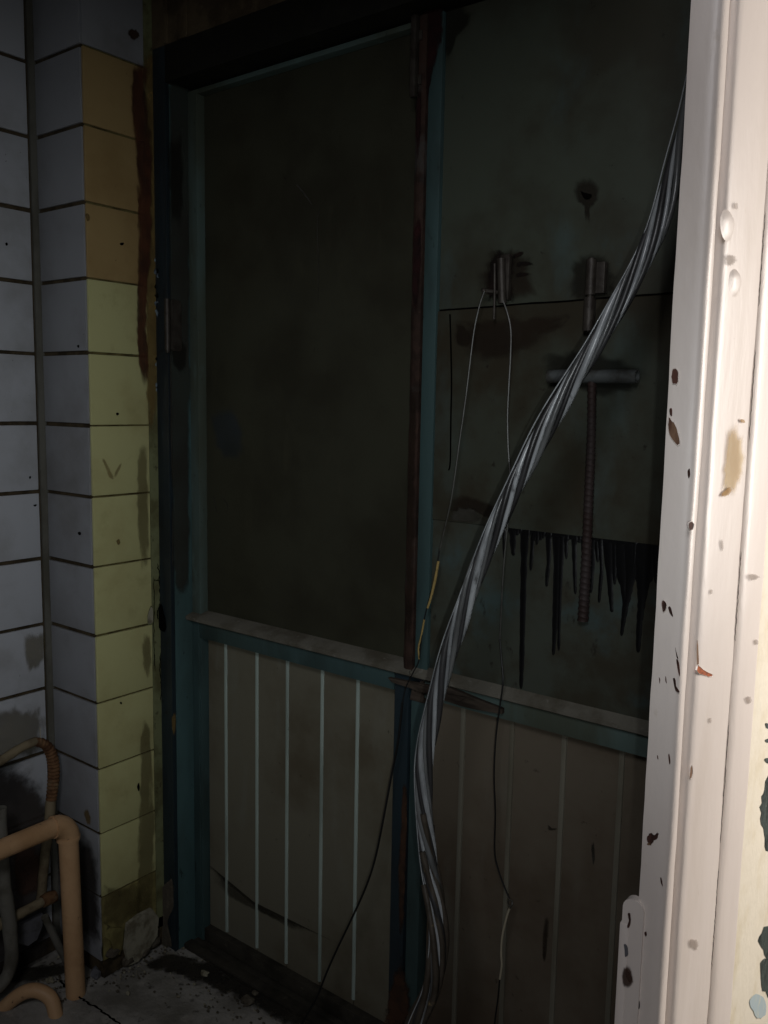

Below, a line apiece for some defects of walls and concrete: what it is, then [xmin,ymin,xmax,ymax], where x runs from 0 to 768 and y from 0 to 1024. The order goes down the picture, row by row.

corrosion [132,55,157,423]
peeling [671,368,679,385]
peeling [668,408,681,447]
damp [721,434,743,496]
damp [502,529,659,689]
peeling [695,642,713,677]
peeling [760,778,768,851]
peeling [758,926,768,996]